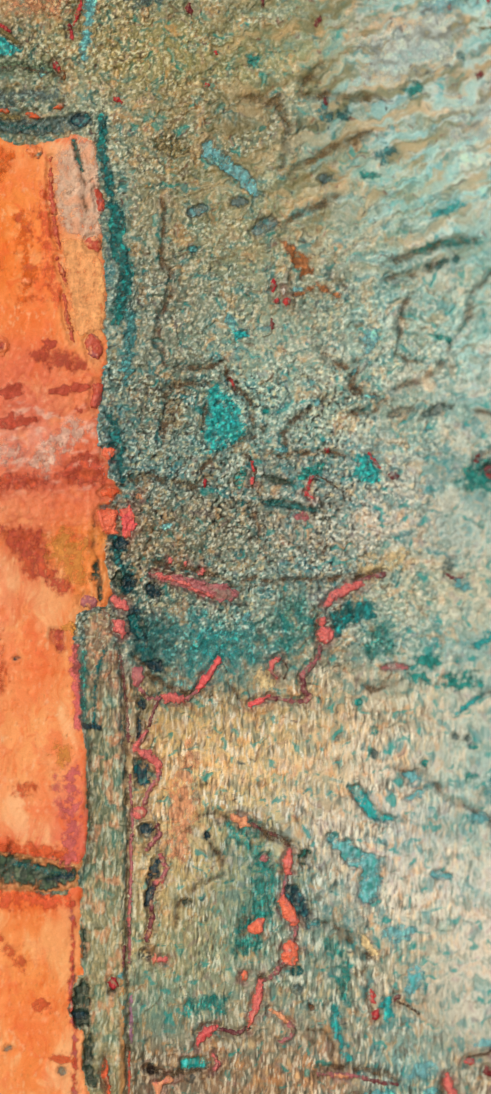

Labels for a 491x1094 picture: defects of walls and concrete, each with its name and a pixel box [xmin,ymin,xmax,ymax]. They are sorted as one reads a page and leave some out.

peeling [52,59,66,80]
spalling [0,103,105,212]
peeling [48,156,103,360]
peeling [90,383,104,409]
peeling [101,447,115,460]
peeling [97,487,143,550]
spalling [0,852,77,891]